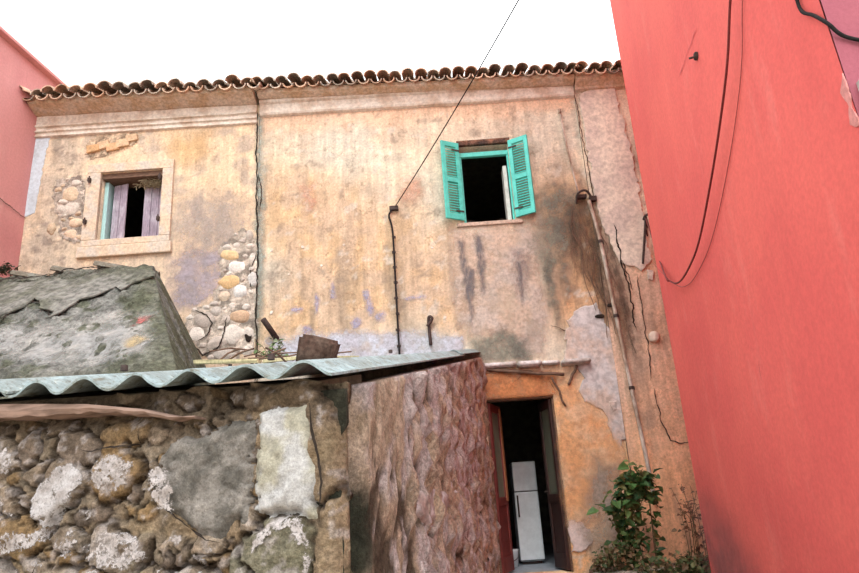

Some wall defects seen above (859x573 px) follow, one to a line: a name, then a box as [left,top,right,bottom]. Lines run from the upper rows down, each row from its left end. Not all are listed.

flaking render [47,175,85,244]
crack [195,310,227,356]
flaking render [185,228,259,360]
crack [250,112,262,382]
damp [459,237,485,314]
crack [614,225,688,444]
flaking render [458,302,626,521]